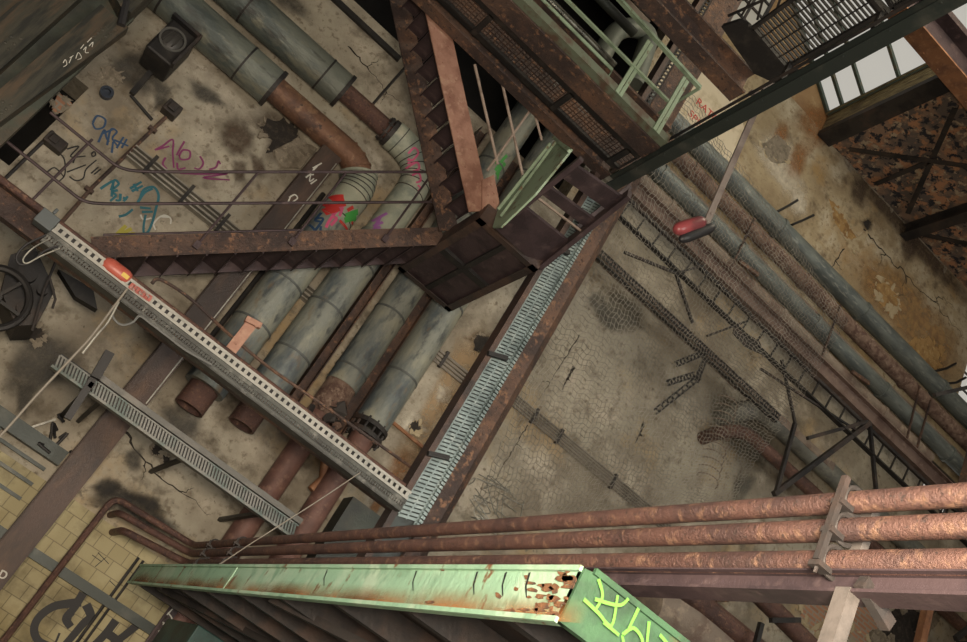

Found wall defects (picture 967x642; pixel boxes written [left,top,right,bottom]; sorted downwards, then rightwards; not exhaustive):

peeling [758,133,791,166]
peeling [873,275,902,319]
crack [863,229,963,338]
crack [125,431,209,515]
corrosion [247,588,403,603]
corrosion [421,572,479,609]
corrosion [495,571,577,622]